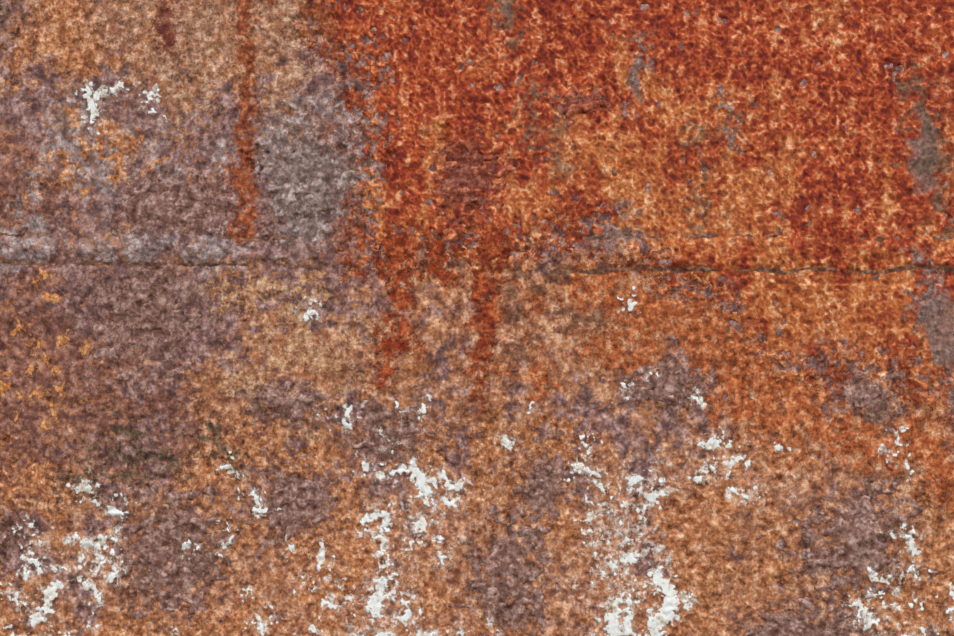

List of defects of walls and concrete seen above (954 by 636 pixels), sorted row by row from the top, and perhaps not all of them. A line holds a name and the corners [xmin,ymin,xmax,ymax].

crack [563,231,832,240]
crack [857,235,900,243]
crack [0,229,356,274]
crack [548,262,954,275]